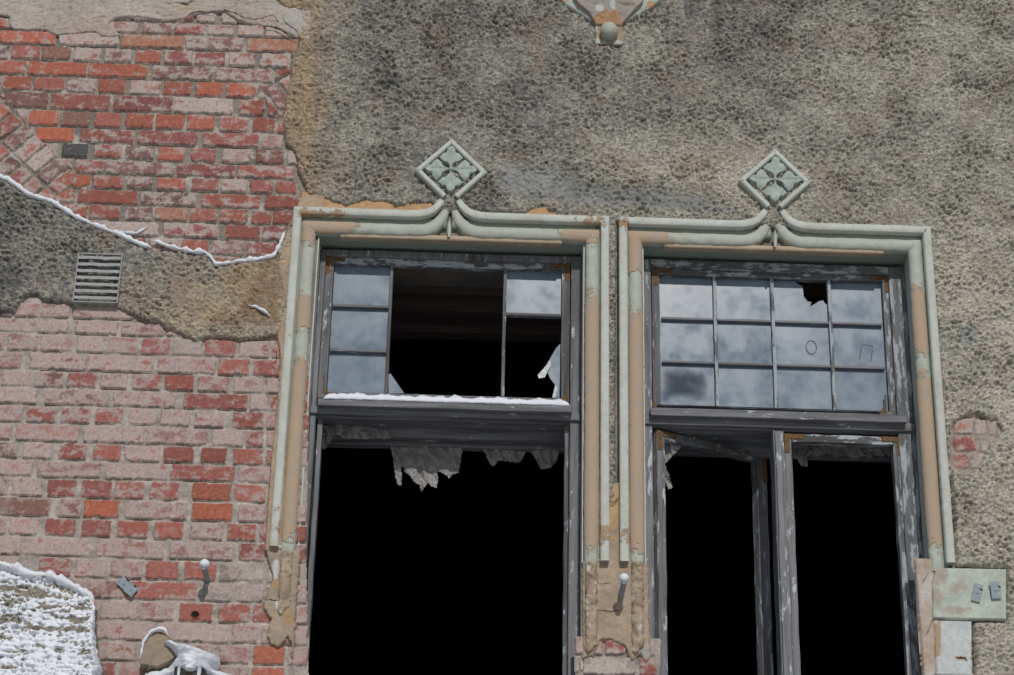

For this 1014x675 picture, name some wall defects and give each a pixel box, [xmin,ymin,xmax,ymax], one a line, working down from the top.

crack [182,0,298,39]
spalling [0,13,600,268]
spalling [0,289,311,675]
peeling [911,282,1002,554]